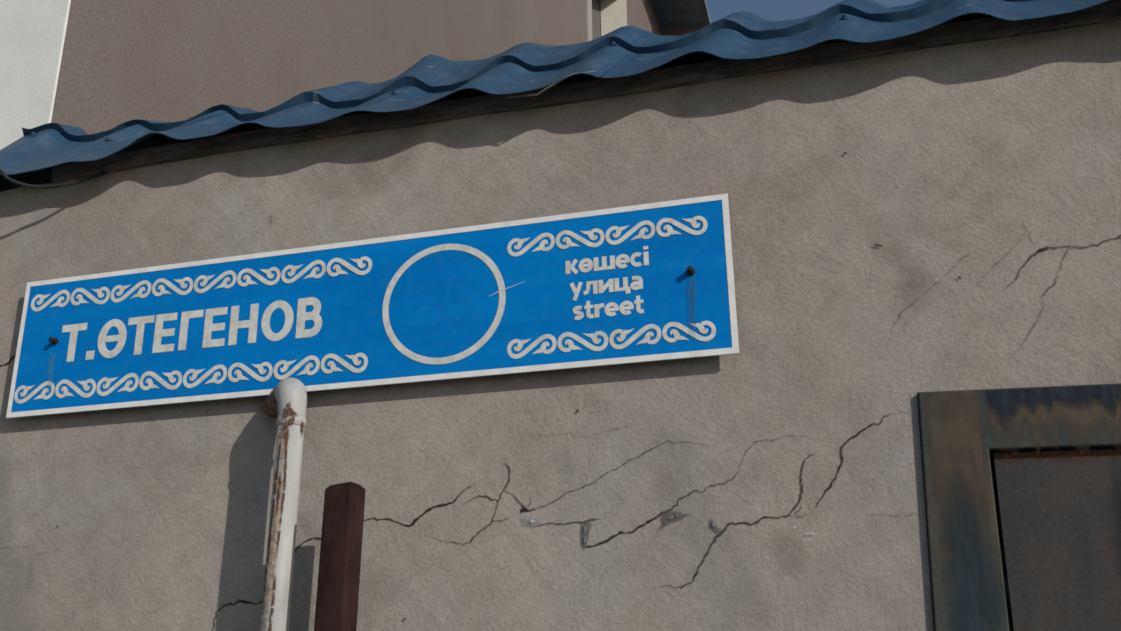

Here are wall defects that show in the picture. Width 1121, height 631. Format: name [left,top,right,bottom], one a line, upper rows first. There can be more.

crack [1018,235,1121,288]
rust [261,403,304,631]
crack [364,440,735,547]
crack [670,415,886,588]
crack [212,599,263,631]